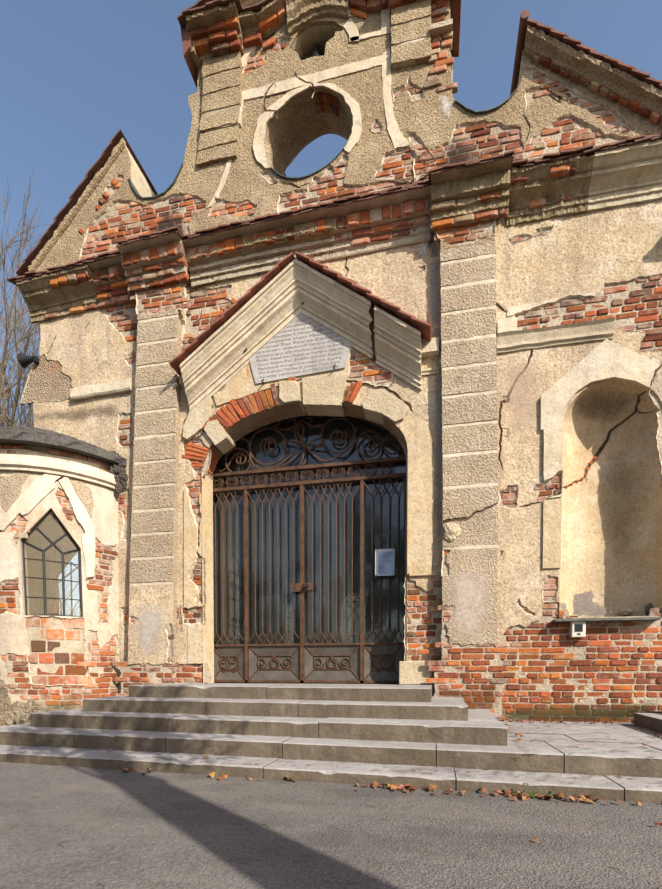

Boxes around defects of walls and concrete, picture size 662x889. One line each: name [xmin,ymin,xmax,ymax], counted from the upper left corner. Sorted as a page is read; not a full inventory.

crack [263,84,278,119]
flaking render [277,64,635,213]
flaking render [79,174,257,260]
crack [368,305,376,362]
flaking render [513,273,662,352]
flaking render [20,354,73,405]
crack [384,387,413,412]
crack [498,349,533,470]
crack [521,353,662,507]
crack [443,503,497,524]
flaking render [0,436,212,709]
flaking render [404,549,662,723]